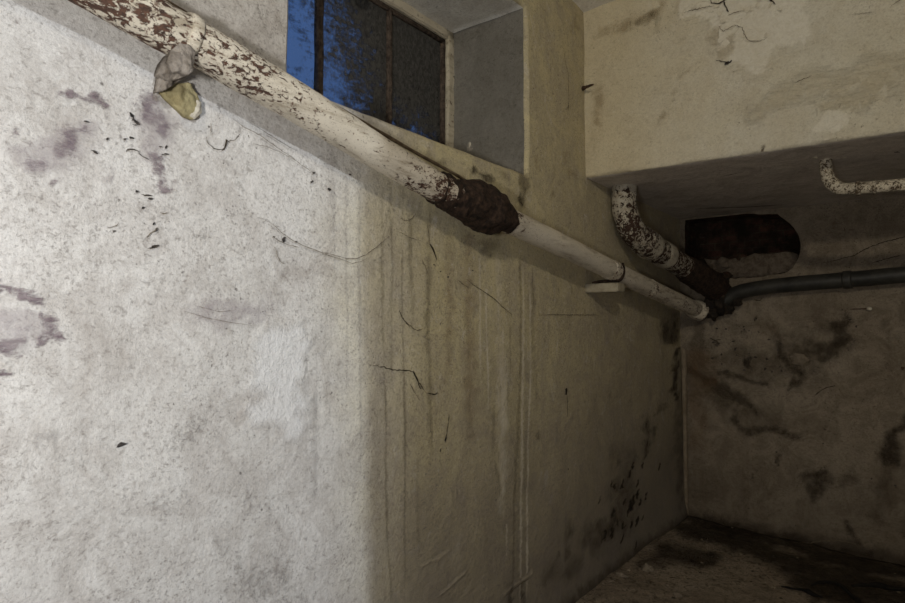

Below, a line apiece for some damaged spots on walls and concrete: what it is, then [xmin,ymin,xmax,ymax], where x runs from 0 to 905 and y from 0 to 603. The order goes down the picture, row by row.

damp [60,90,109,107]
damp [142,93,169,137]
damp [54,127,85,157]
damp [149,153,170,193]
damp [0,285,65,345]
damp [0,340,25,354]
crack [374,365,437,400]